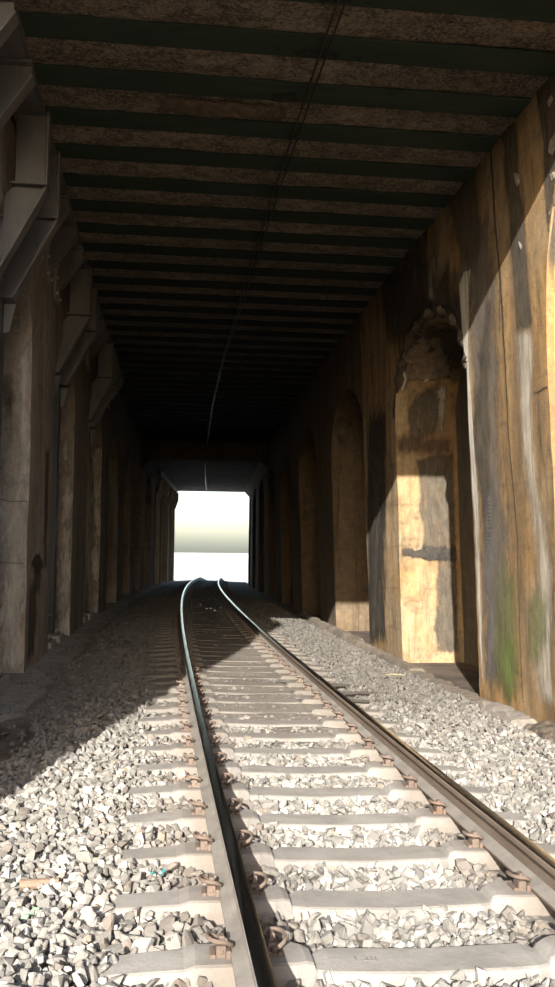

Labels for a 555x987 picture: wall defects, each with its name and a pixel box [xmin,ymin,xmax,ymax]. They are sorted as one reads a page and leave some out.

spalling [393,301,467,418]
water stain [380,170,509,679]